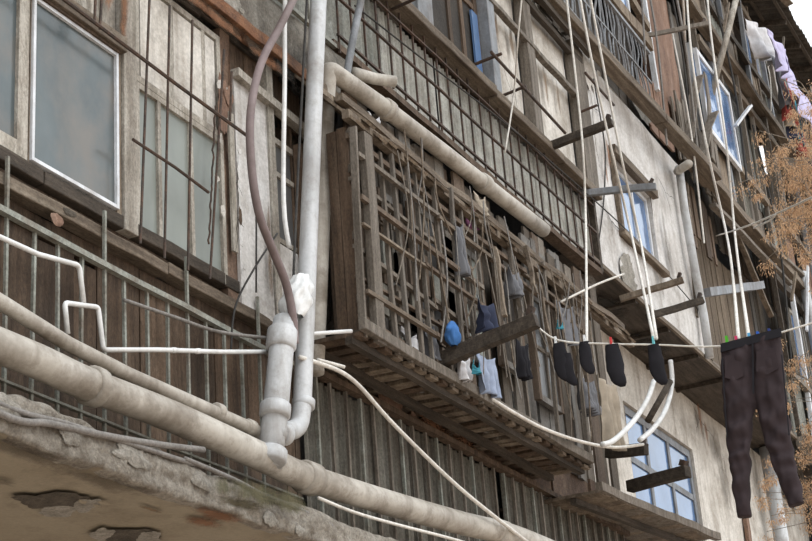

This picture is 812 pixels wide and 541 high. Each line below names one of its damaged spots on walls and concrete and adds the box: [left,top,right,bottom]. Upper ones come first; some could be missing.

corrosion [191,0,233,33]
spalling [0,392,398,541]